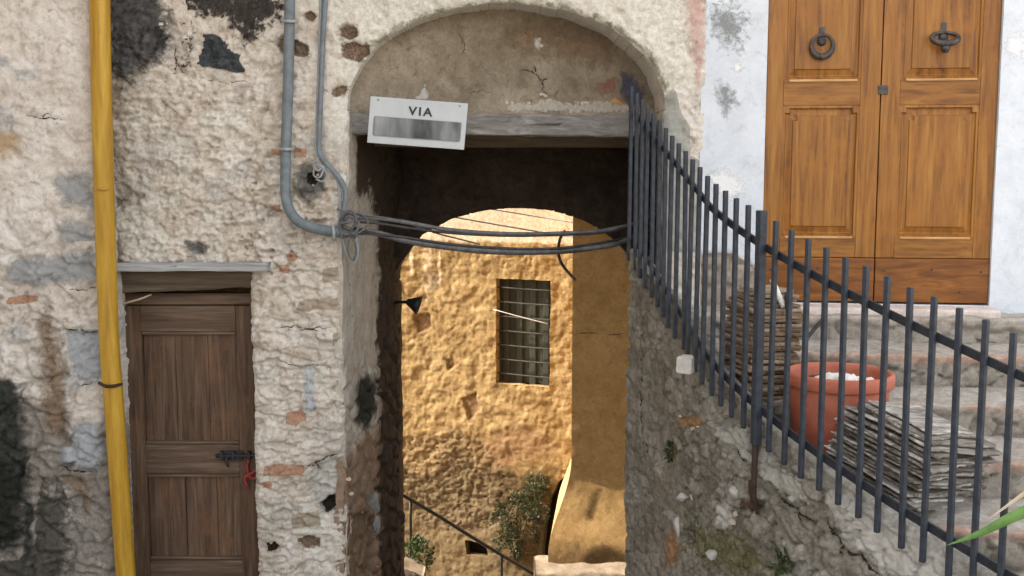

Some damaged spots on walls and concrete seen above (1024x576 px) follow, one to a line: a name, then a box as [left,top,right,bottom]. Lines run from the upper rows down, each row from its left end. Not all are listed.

water stain [110,0,284,81]
spalling [336,24,372,63]
water stain [711,4,747,41]
crack [523,67,550,98]
crack [281,282,353,331]
water stain [0,380,72,576]